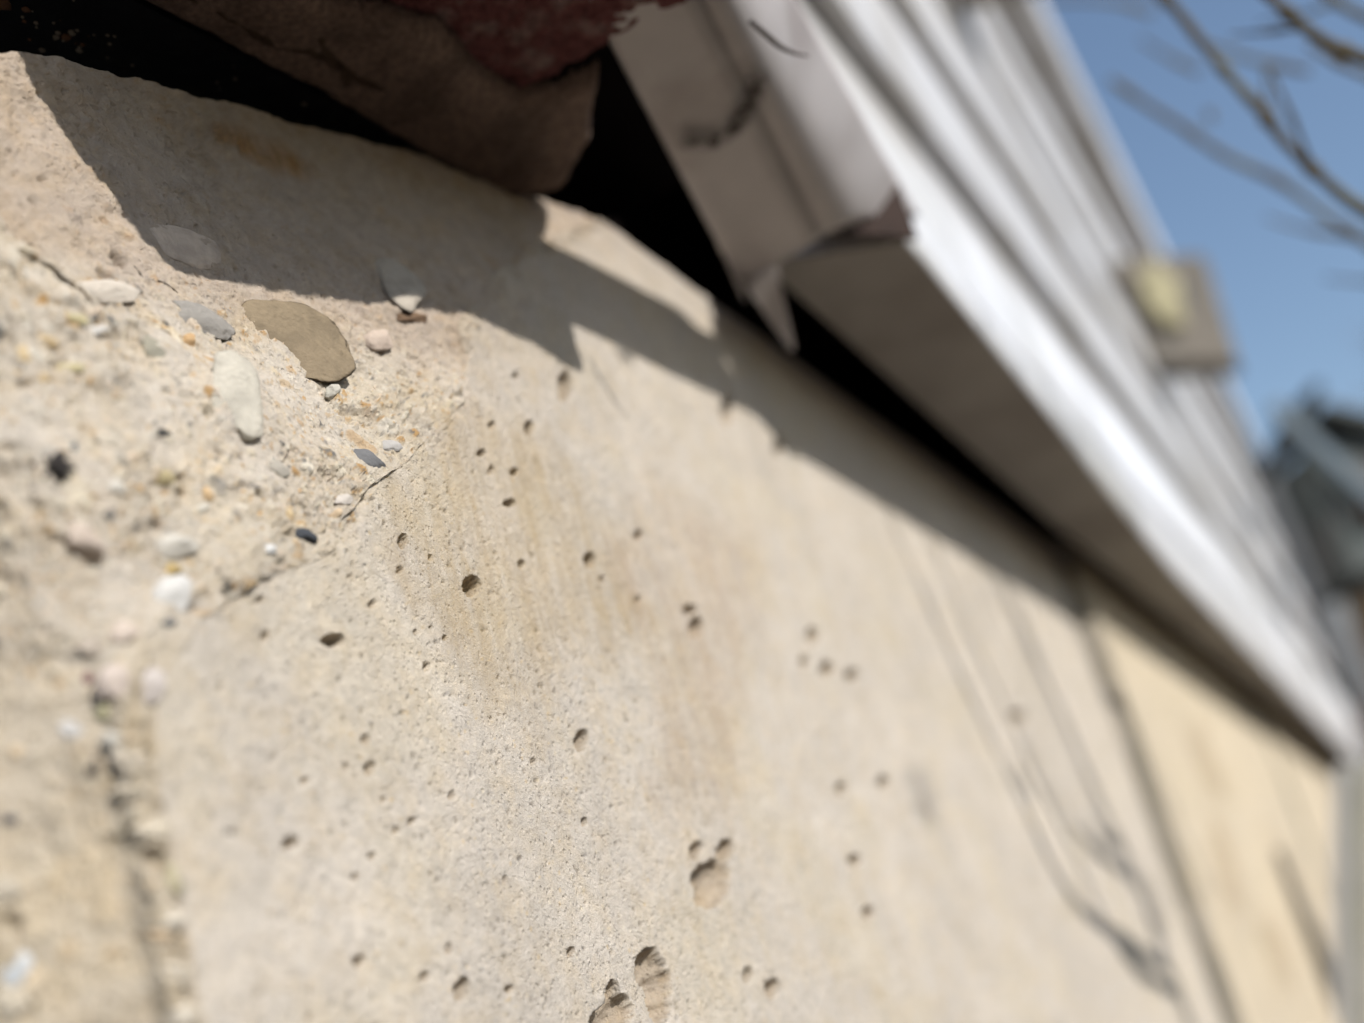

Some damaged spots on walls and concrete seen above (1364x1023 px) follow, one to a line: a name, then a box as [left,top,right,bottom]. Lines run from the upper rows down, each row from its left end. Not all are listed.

spalling [0,51,608,1023]